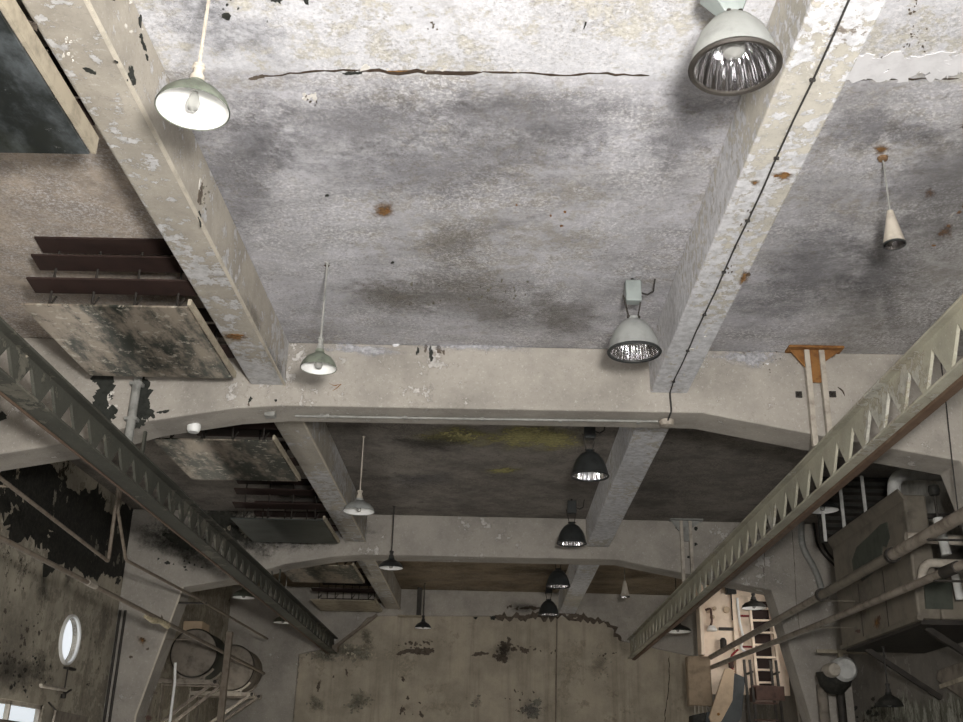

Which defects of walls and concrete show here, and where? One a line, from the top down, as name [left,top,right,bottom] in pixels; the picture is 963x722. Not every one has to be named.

peeling [125,14,149,61]
peeling [166,0,272,51]
peeling [847,0,963,83]
crack [248,64,649,80]
rust [376,204,391,216]
peeling [90,376,118,422]
peeling [135,377,169,428]
leakage [421,427,579,450]
peeling [0,464,133,585]
spalling [396,641,434,656]
spalling [472,637,556,664]